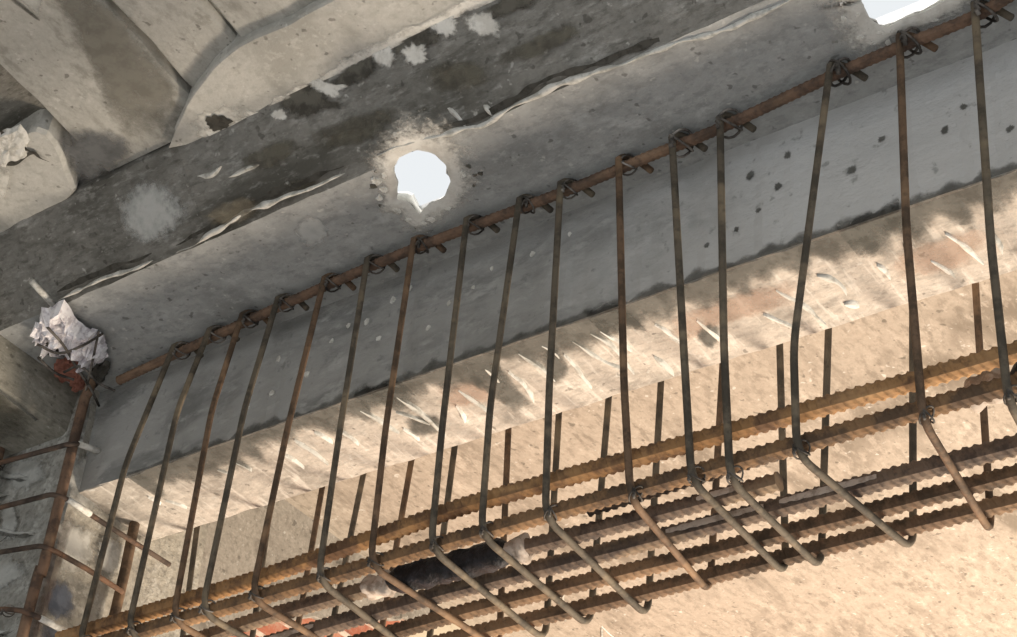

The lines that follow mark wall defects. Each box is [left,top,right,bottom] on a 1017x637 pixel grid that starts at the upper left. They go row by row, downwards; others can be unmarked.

spalling [826,0,970,53]
spalling [271,0,532,120]
spalling [370,124,483,233]
spalling [29,278,115,407]
leakage [126,163,1017,496]
flaking render [57,522,125,575]
flaking render [197,499,341,589]
flaking render [263,553,365,587]
flaking render [191,572,378,631]
flaking render [291,592,406,621]
flaking render [378,607,430,622]
flaking render [409,623,461,637]